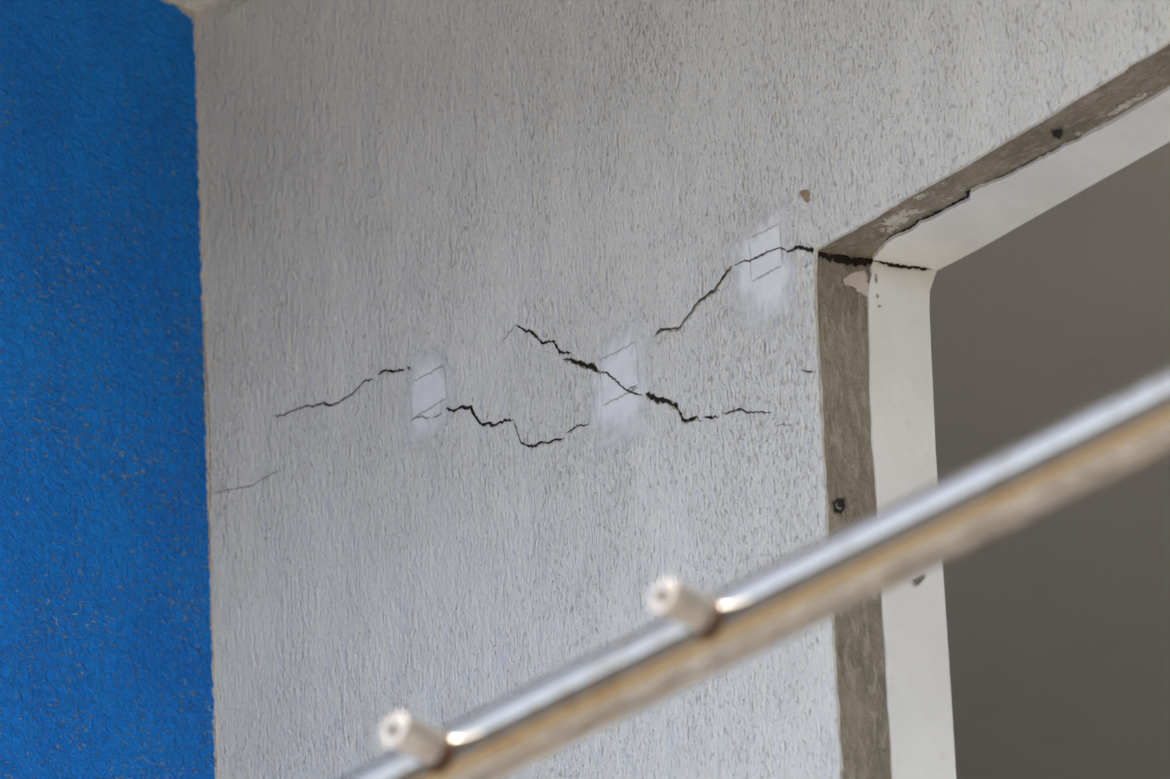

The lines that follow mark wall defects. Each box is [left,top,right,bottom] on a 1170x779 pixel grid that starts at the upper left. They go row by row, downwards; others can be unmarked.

crack [275,366,411,417]
crack [503,325,790,426]
crack [411,405,587,448]